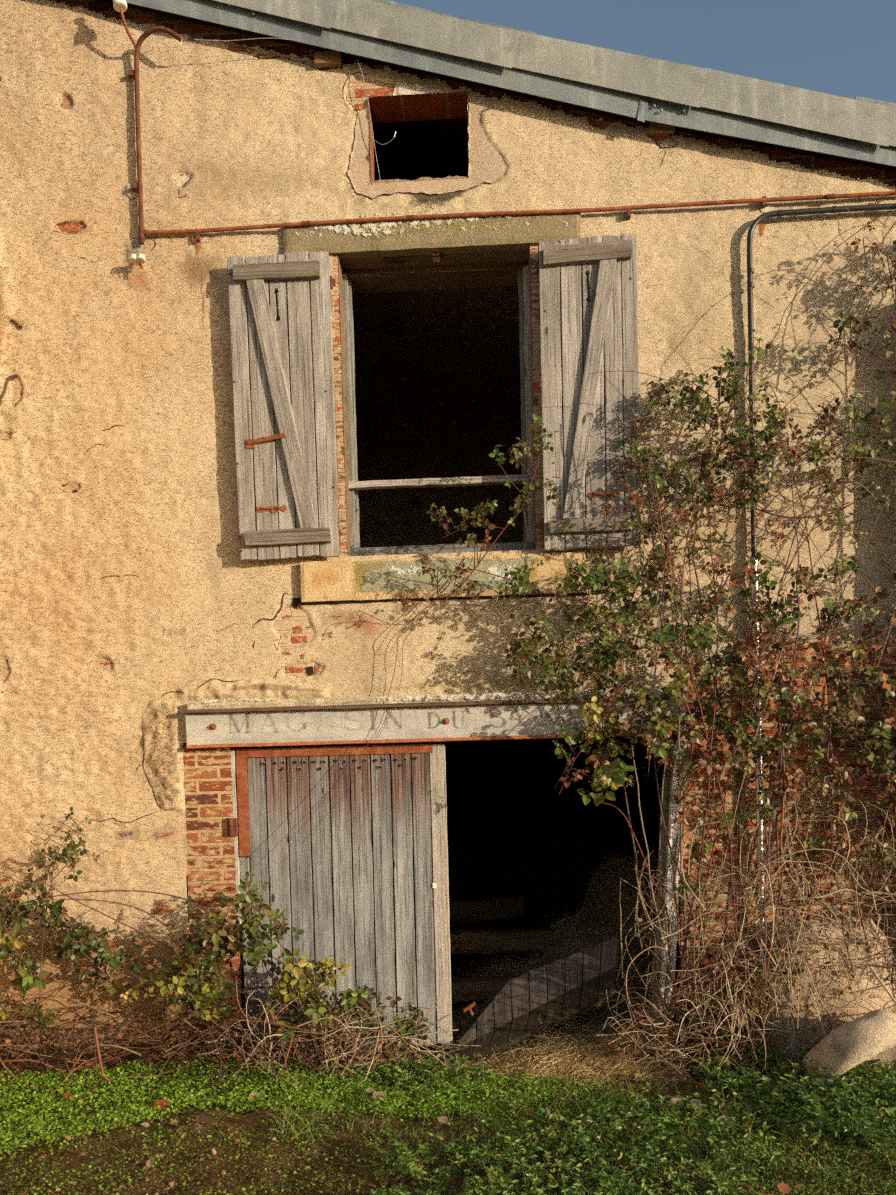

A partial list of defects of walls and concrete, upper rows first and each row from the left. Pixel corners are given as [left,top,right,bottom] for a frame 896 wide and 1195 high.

peeling [293,76,531,239]
peeling [54,219,86,234]
crack [213,593,290,679]
spalling [273,598,324,678]